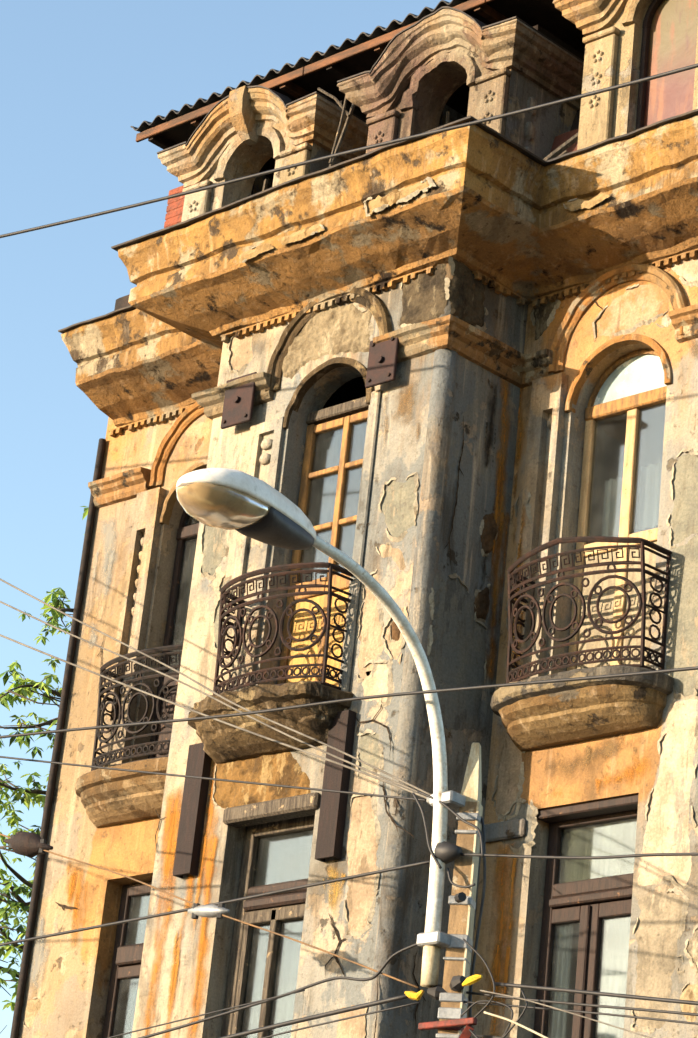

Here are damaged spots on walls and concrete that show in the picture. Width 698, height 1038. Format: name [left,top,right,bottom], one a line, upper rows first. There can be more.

peeling [363,177,436,217]
peeling [563,192,610,211]
peeling [671,258,698,287]
peeling [376,472,419,570]
crack [444,416,464,570]
rust [487,381,524,677]
crack [355,700,414,837]
peeling [630,447,698,1038]
rust [145,792,181,1038]
rust [185,760,217,1038]
crack [325,914,346,977]
rust [490,847,517,1036]